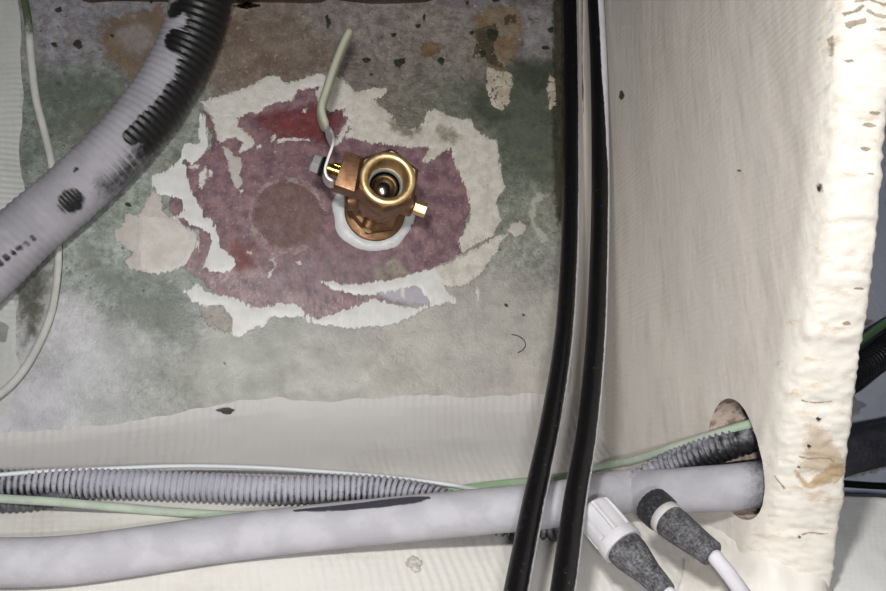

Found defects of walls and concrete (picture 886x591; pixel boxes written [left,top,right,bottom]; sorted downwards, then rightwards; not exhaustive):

rust [473,5,522,72]
peeling [486,67,514,111]
rust [795,427,843,488]